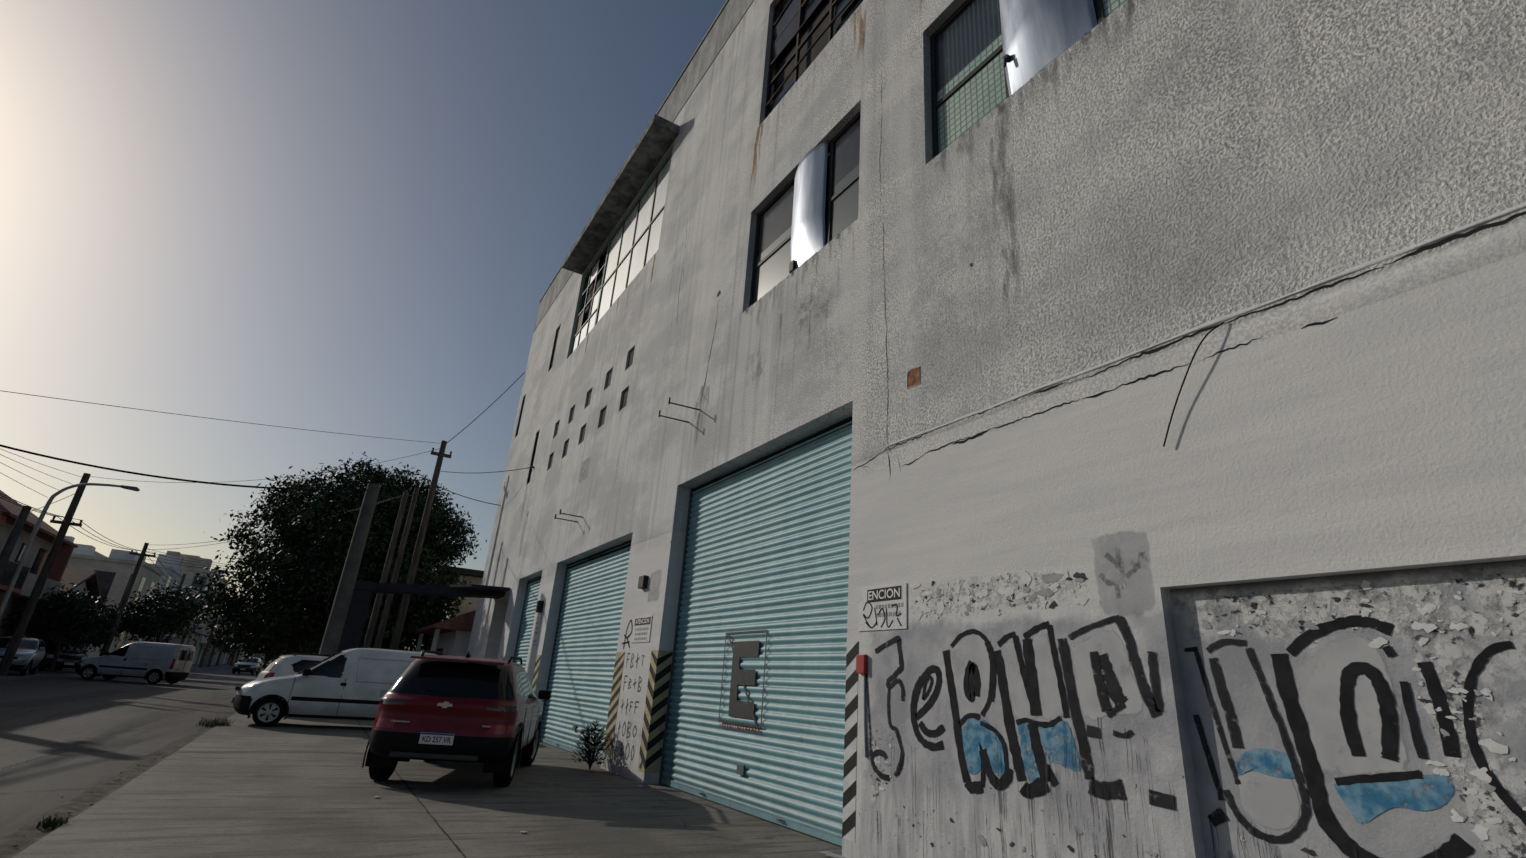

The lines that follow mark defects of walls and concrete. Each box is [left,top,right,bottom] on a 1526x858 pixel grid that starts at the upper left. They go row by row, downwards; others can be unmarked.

crack [854,211,1526,470]
peeling [910,553,1142,621]
peeling [1201,573,1526,858]